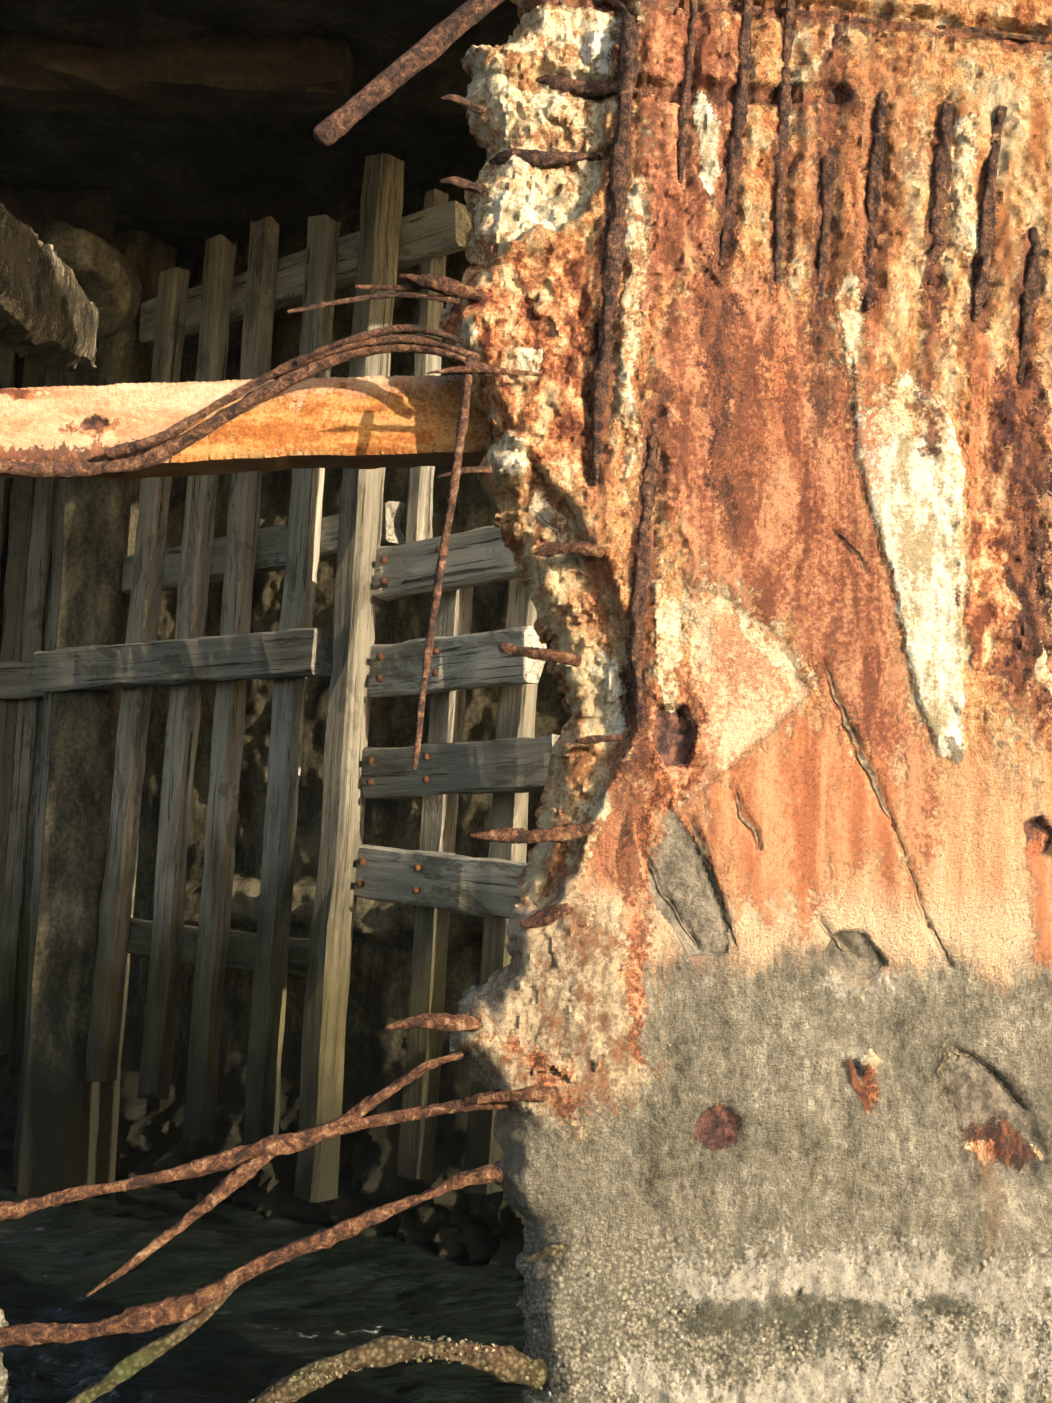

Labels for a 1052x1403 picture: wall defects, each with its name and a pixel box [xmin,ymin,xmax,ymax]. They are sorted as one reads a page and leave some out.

rust [0,376,491,463]
spalling [440,0,809,957]
rust [519,0,1052,1069]
crack [818,663,951,963]